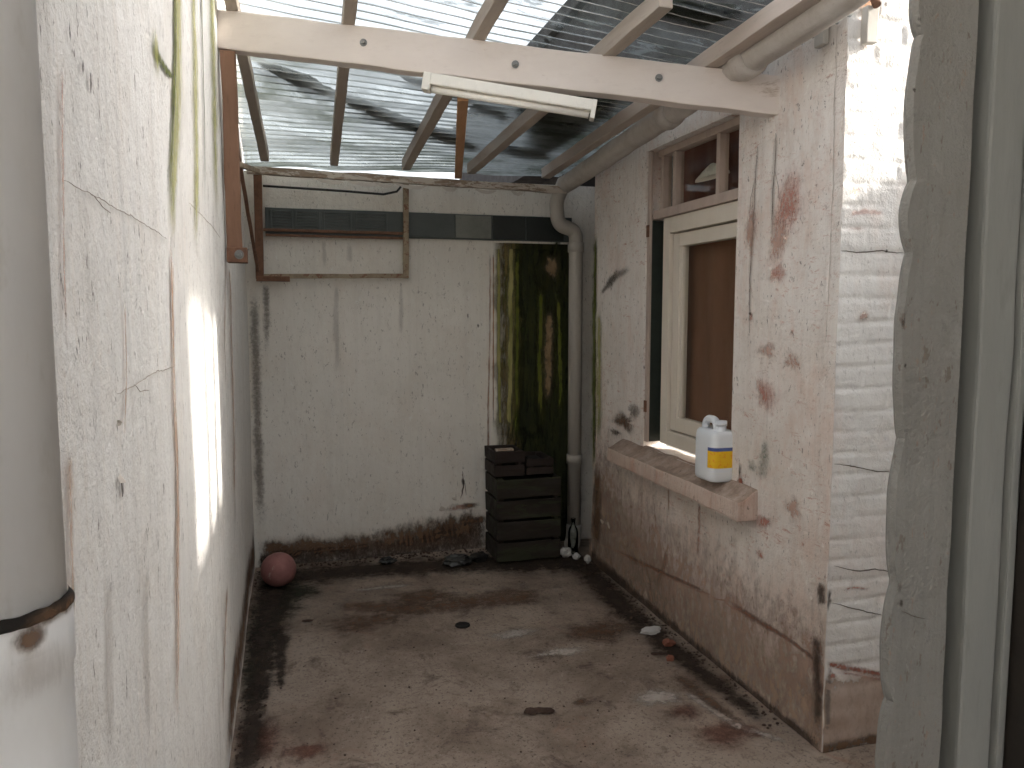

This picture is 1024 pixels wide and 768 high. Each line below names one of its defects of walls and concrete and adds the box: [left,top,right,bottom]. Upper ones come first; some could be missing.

crack [64,180,167,239]
crack [118,367,171,394]
damp [251,288,269,503]
damp [611,406,638,435]
crack [838,464,890,472]
crack [836,565,888,573]
damp [223,457,884,768]